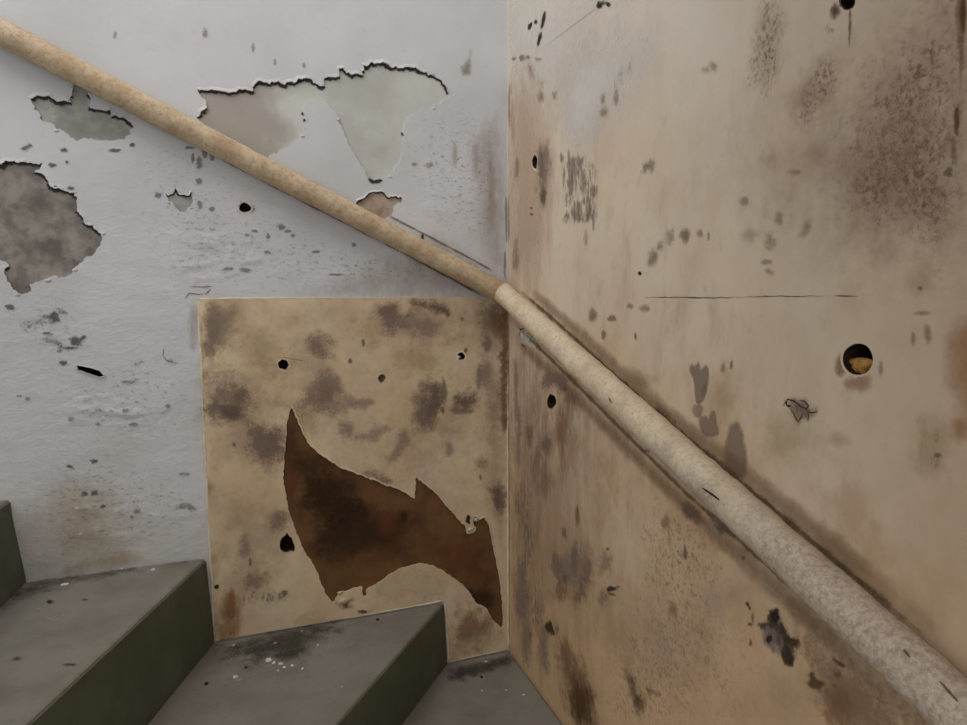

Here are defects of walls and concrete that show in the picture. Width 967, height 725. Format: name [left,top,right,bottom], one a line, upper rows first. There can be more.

peeling [27,84,135,152]
peeling [196,59,451,219]
peeling [155,146,215,230]
peeling [0,144,106,310]
crack [646,293,805,301]
peeling [24,310,107,378]
leakage [415,366,489,426]
leakage [481,306,551,462]
leakage [690,363,709,403]
leakage [699,411,746,478]
leakage [758,608,799,667]
leakage [565,656,592,723]